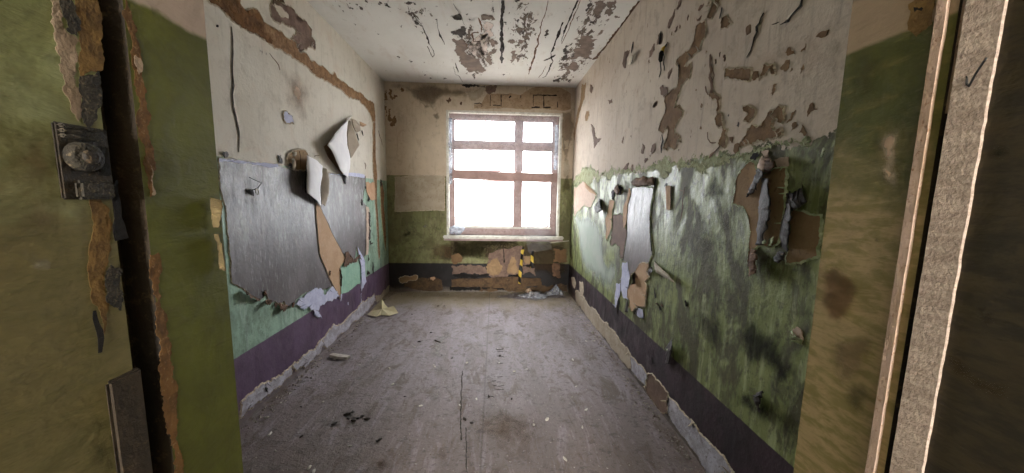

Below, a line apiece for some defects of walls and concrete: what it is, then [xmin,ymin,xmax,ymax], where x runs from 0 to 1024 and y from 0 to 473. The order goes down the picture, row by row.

crack [231,27,240,146]
flaking render [446,0,620,140]
peeling [572,0,825,312]
peeling [239,166,377,419]
flaking render [479,246,735,473]
leakage [744,325,785,379]